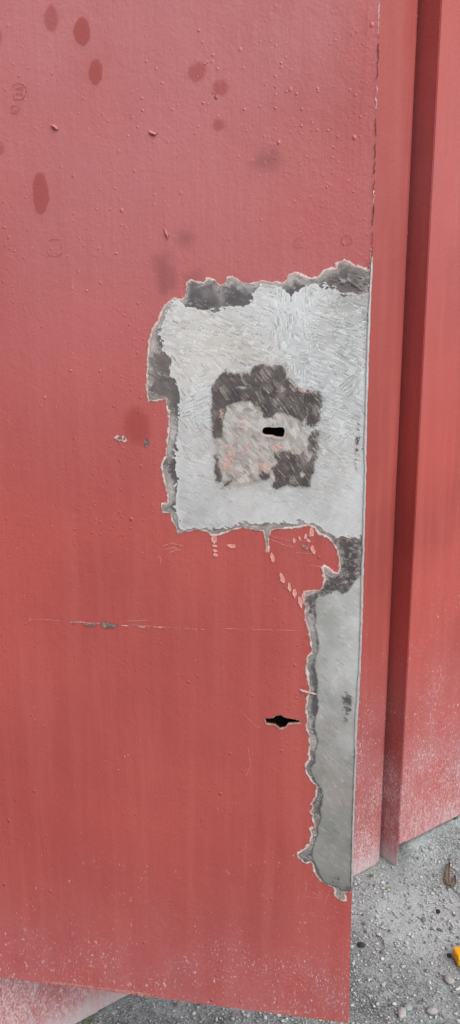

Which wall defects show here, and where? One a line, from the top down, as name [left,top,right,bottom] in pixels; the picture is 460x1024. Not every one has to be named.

peeling [145,43,379,902]